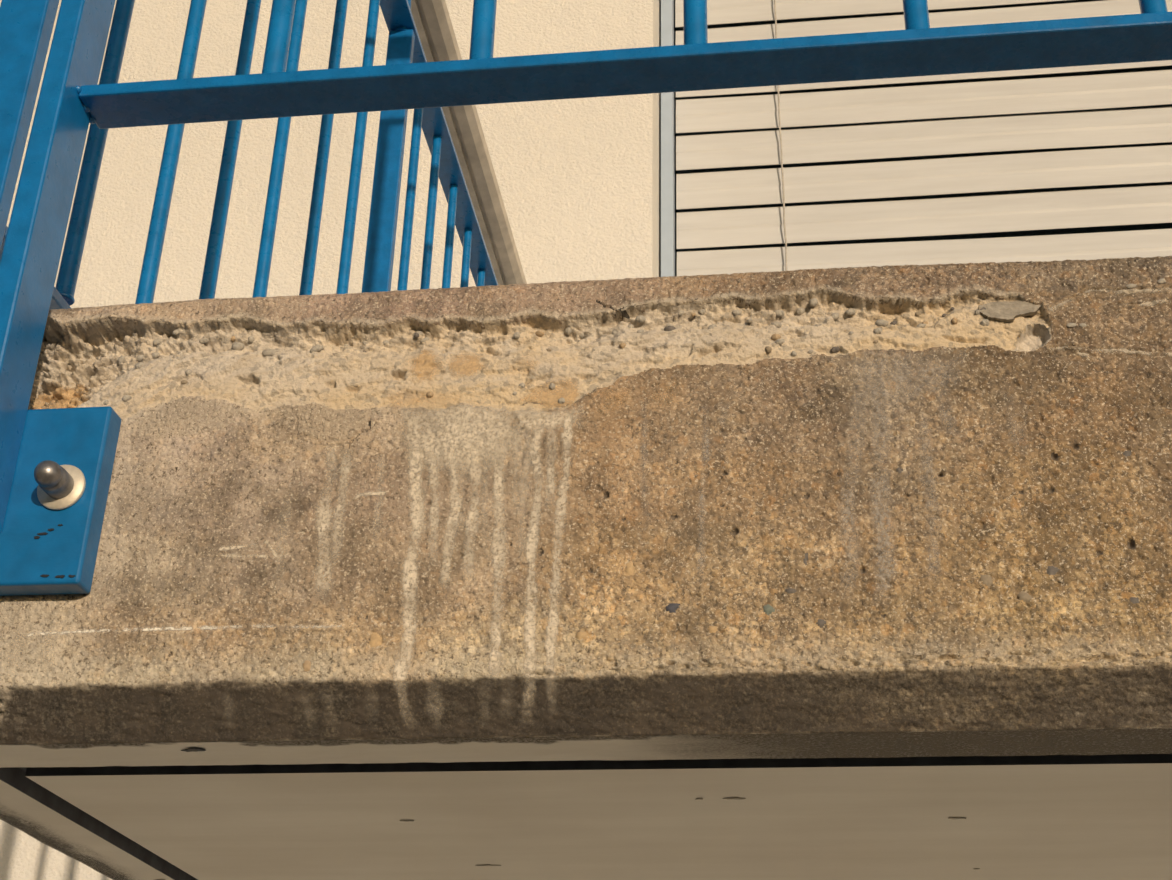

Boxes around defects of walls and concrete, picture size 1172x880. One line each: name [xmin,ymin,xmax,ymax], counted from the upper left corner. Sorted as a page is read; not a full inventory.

spalling [28,290,1052,419]
crack [1049,288,1172,311]
crack [1050,345,1172,357]
water stain [393,405,578,682]